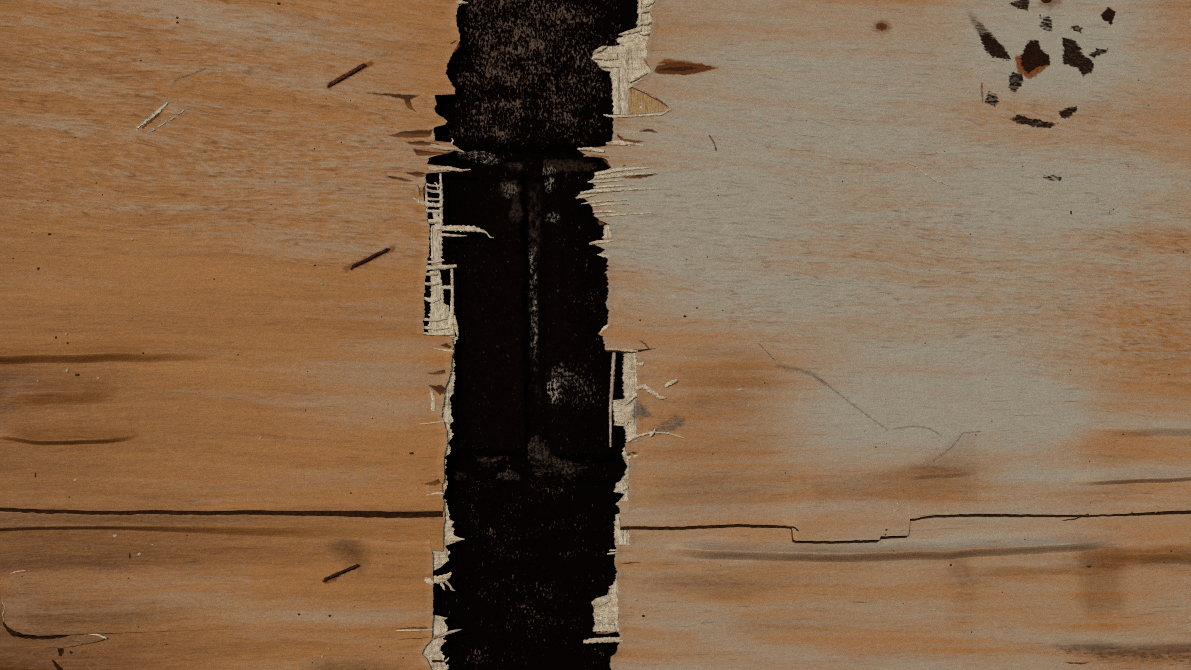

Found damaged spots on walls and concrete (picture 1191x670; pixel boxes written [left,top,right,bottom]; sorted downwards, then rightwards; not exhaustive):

spalling [628,85,669,114]
peeling [390,129,502,165]
spalling [388,171,426,195]
spalling [429,370,445,395]
peeling [425,435,589,485]
crack [0,484,443,551]
crack [619,491,1191,544]